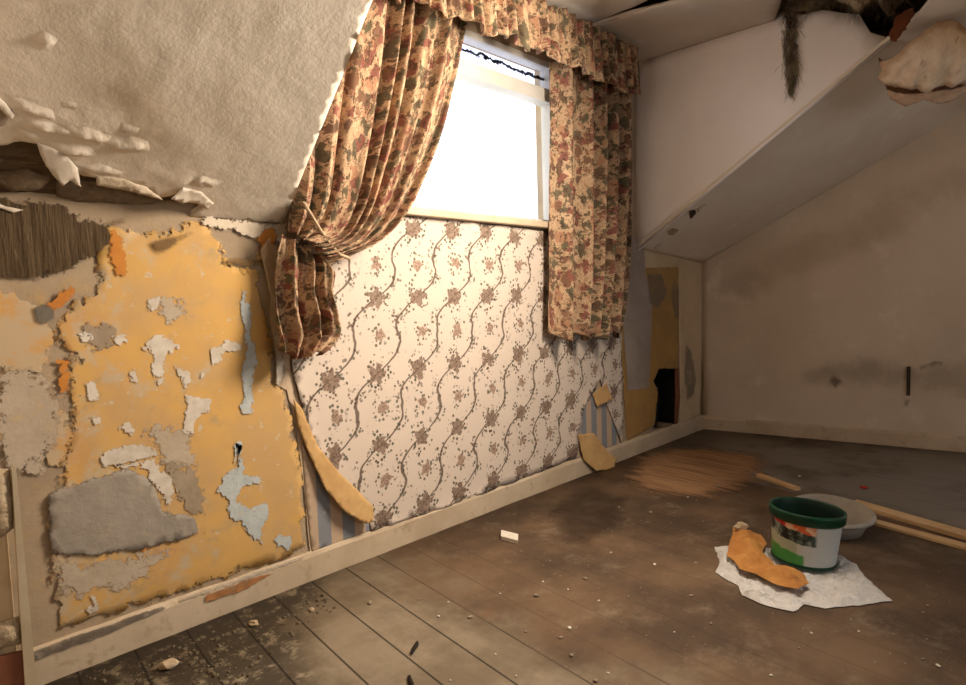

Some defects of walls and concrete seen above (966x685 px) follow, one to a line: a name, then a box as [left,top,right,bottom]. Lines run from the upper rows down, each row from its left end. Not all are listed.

peeling [0,98,14,126]
peeling [0,141,306,629]
peeling [621,239,680,440]
spalling [0,616,21,650]